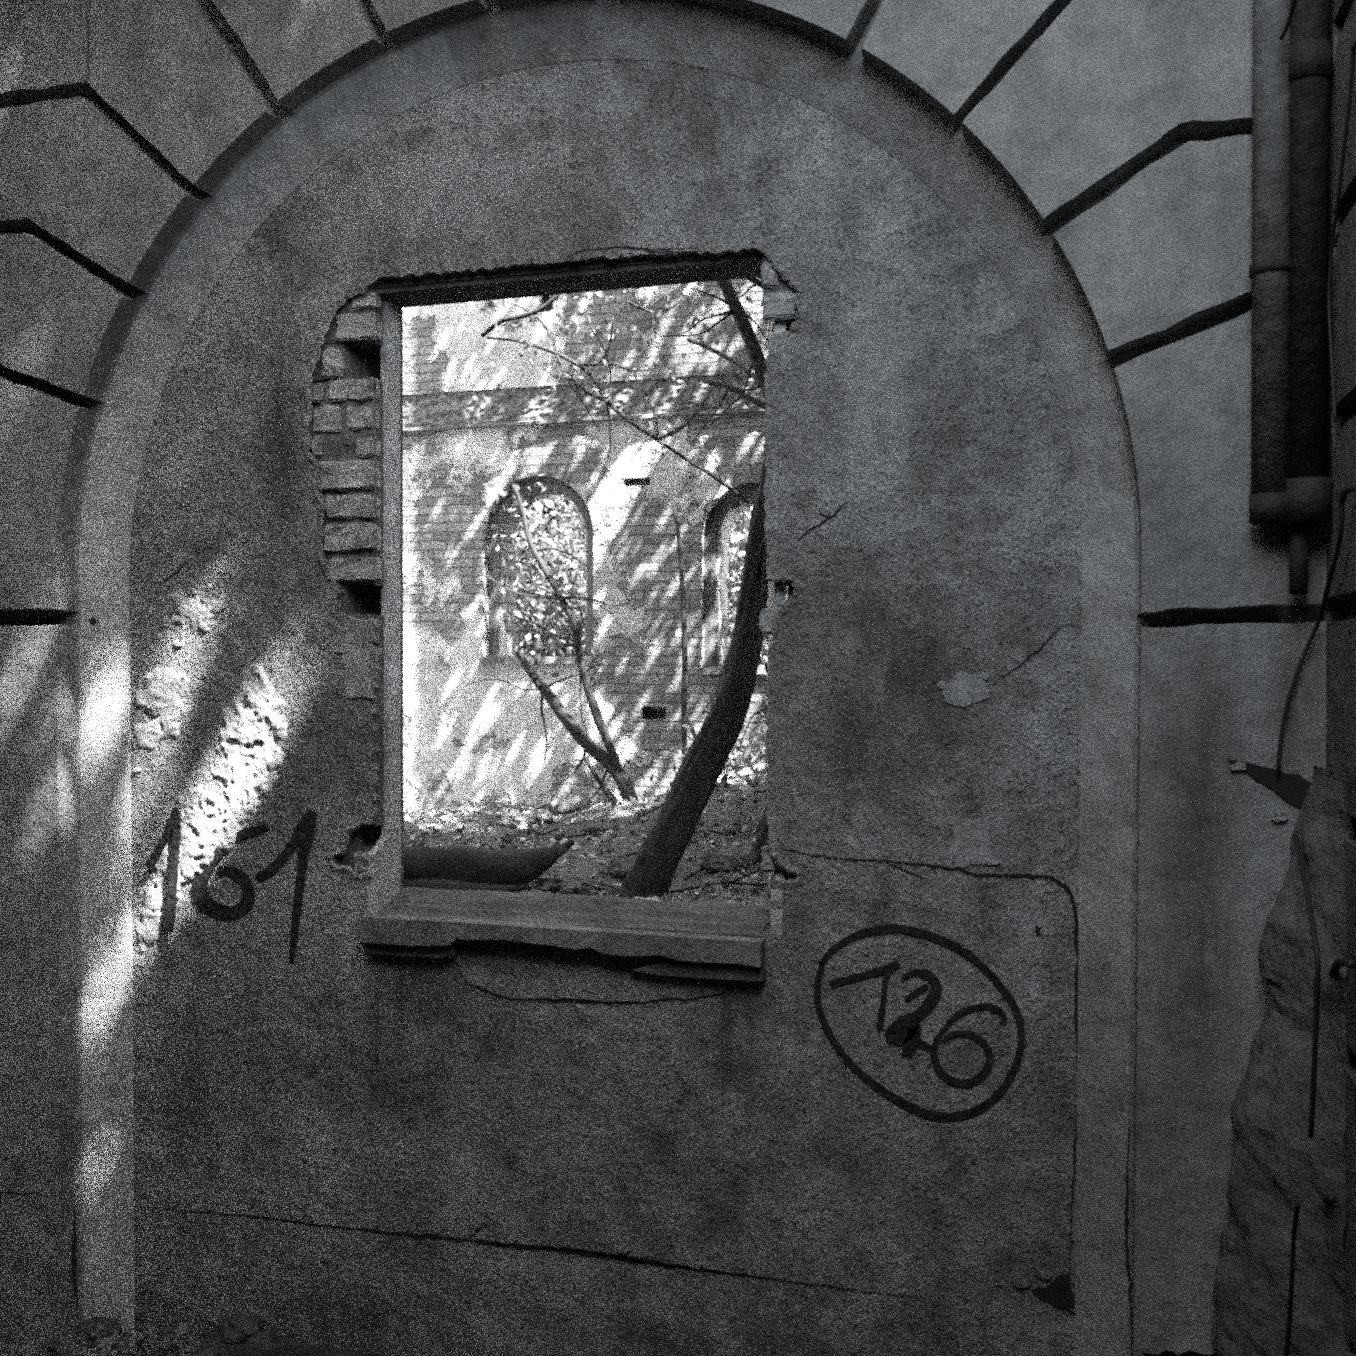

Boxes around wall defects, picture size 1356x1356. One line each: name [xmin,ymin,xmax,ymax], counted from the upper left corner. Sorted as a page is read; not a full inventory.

flaking render [133,283,382,956]